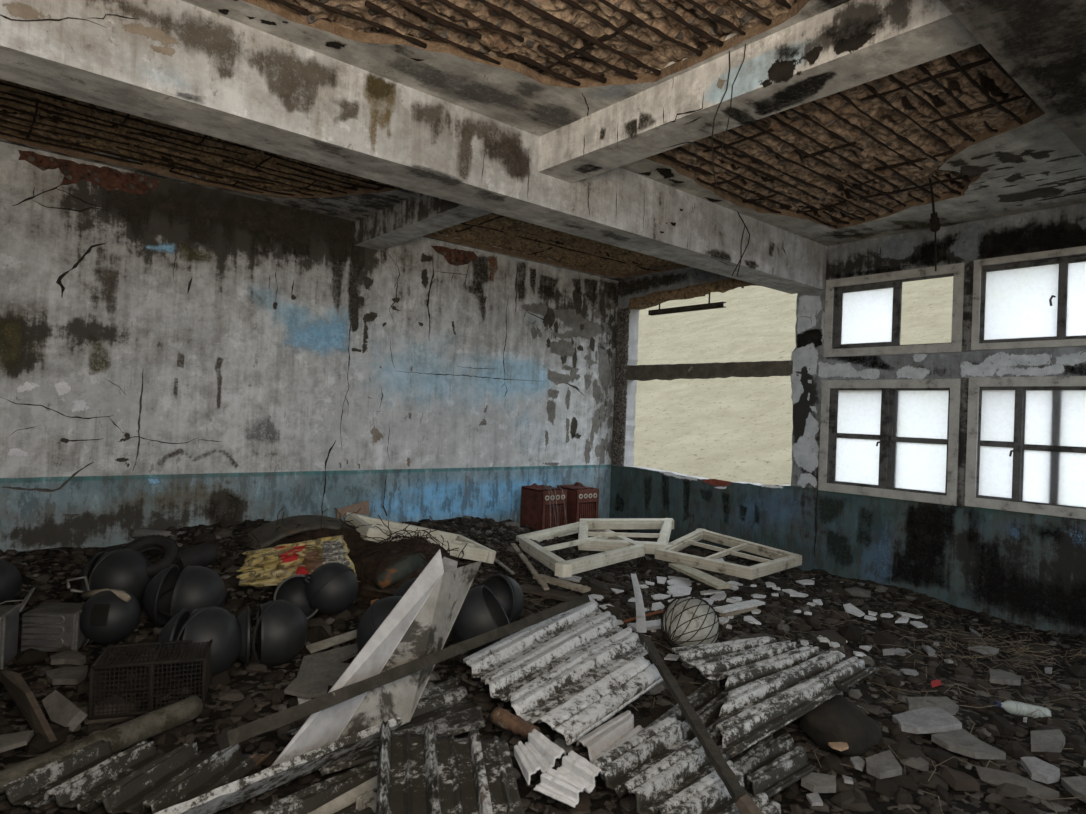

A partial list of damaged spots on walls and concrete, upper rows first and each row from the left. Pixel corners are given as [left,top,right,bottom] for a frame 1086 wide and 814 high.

spalling [247,0,799,86]
spalling [0,79,395,196]
spalling [638,44,1086,228]
crack [56,243,105,298]
water stain [98,270,119,312]
water stain [105,184,365,331]
water stain [470,256,489,317]
water stain [517,263,558,300]
crack [0,368,222,517]
water stain [215,357,223,408]
peeling [521,288,630,466]
peeling [790,295,880,488]